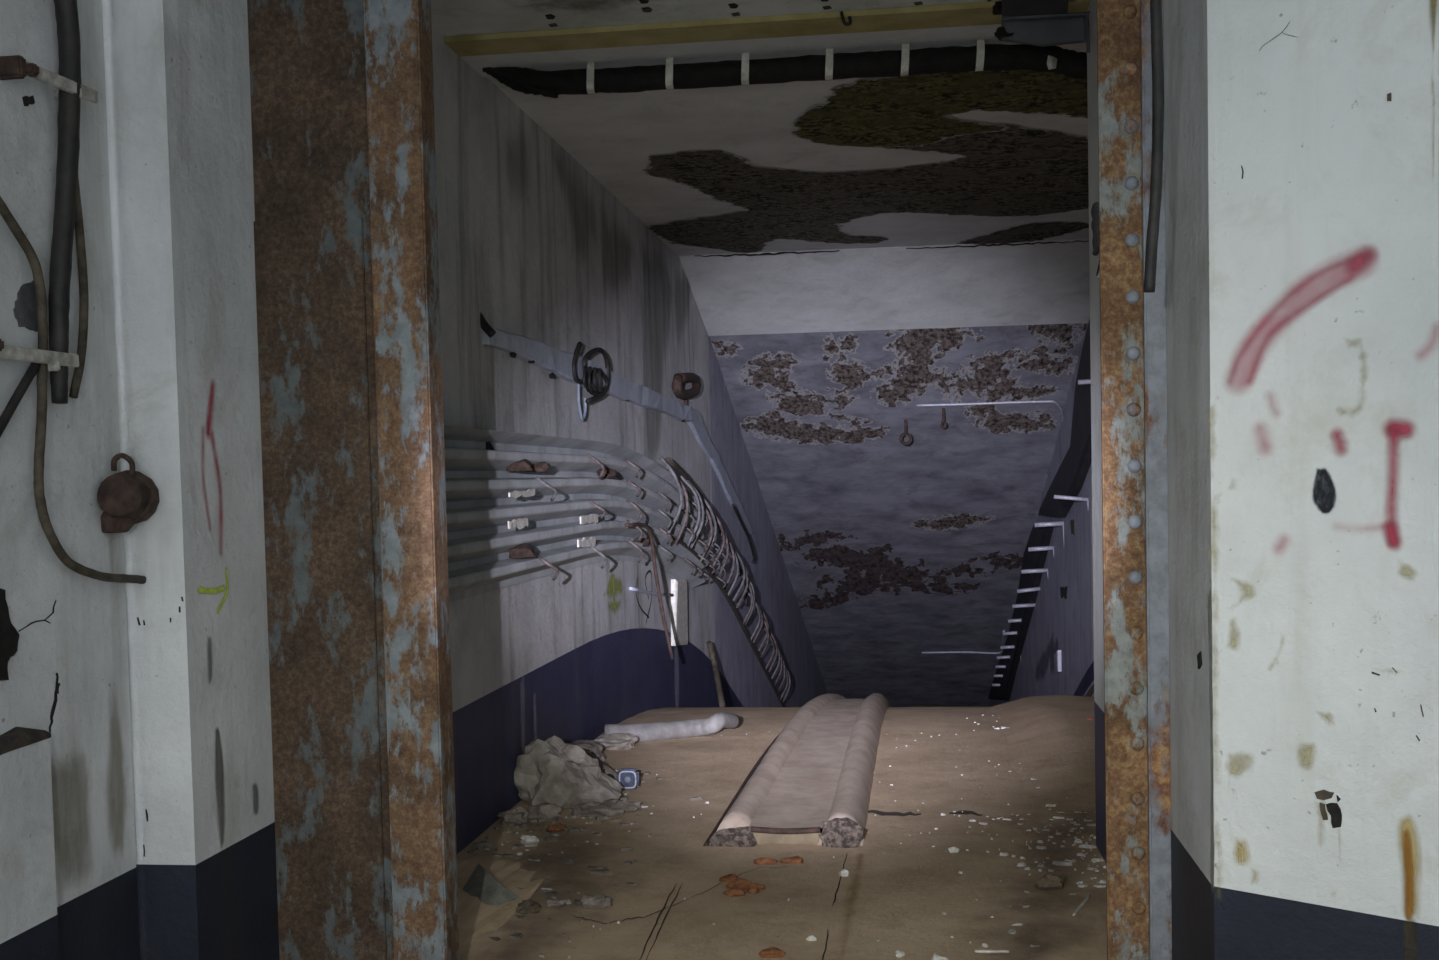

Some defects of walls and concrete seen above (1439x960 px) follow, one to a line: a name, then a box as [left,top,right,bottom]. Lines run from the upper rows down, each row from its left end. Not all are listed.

flaking render [642,70,1099,256]
peeling [711,323,1087,445]
peeling [776,529,1024,611]
peeling [909,513,996,531]
corrosion [1401,819,1417,960]